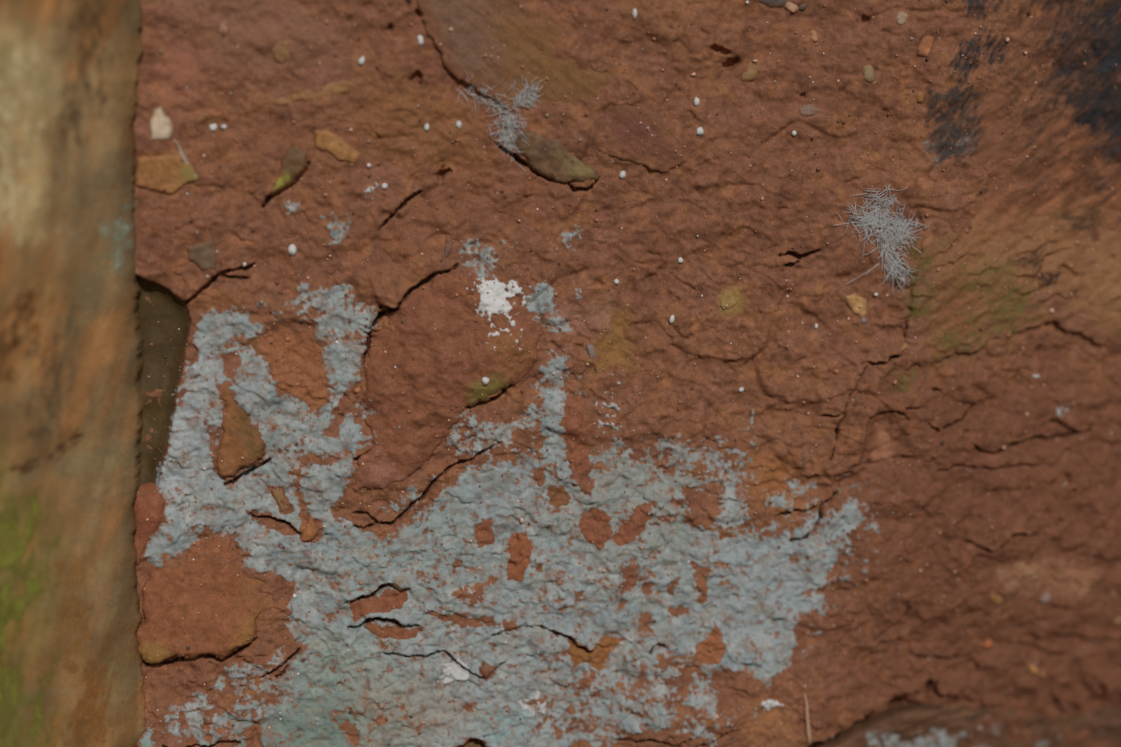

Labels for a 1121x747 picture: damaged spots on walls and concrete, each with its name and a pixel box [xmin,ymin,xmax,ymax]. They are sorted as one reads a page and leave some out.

water stain [923,35,1006,162]
water stain [1046,0,1121,162]
crack [362,264,459,365]
spalling [252,329,329,414]
crack [352,442,500,528]
spalling [475,518,533,582]
spalling [578,502,652,550]
crack [778,350,979,542]
crack [937,419,1092,471]
spalling [349,583,419,640]
spalling [570,635,620,670]
spalling [695,622,726,665]